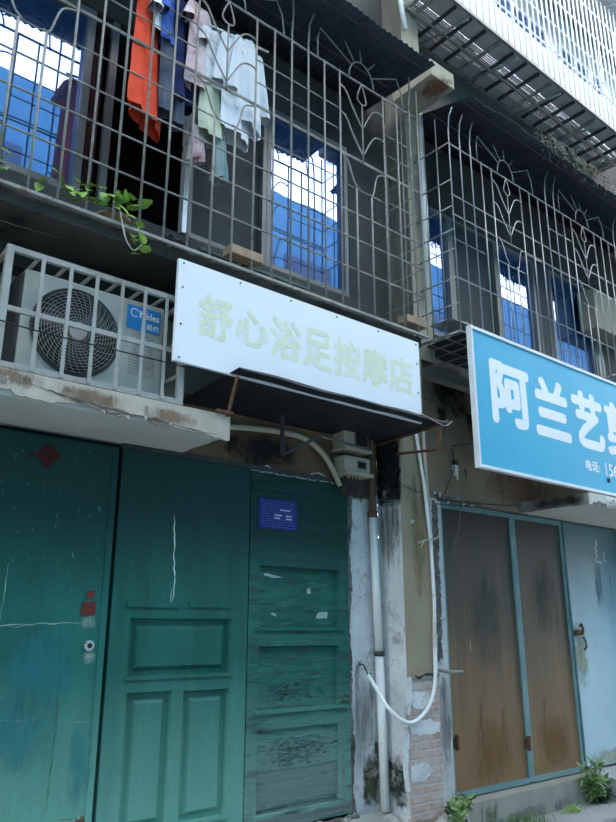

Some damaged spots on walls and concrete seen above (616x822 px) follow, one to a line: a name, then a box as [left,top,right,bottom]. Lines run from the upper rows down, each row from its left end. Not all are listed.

rust [422,78,451,99]
crack [22,382,223,453]
water stain [228,435,293,466]
spalling [403,491,482,822]
water stain [363,742,406,807]